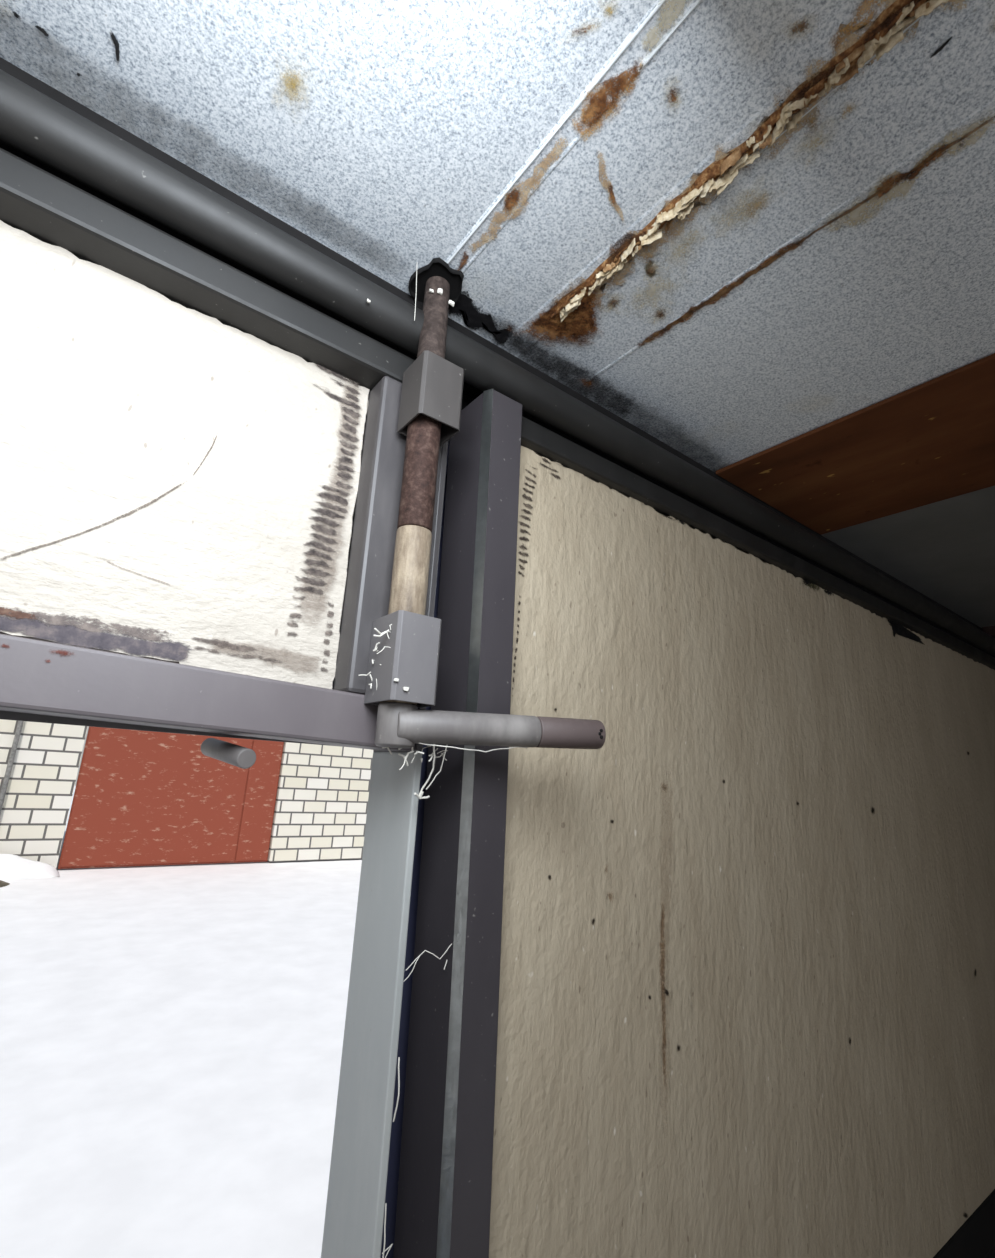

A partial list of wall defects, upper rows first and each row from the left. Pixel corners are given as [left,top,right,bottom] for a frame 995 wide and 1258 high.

rust [458,0,685,270]
rust [508,0,995,346]